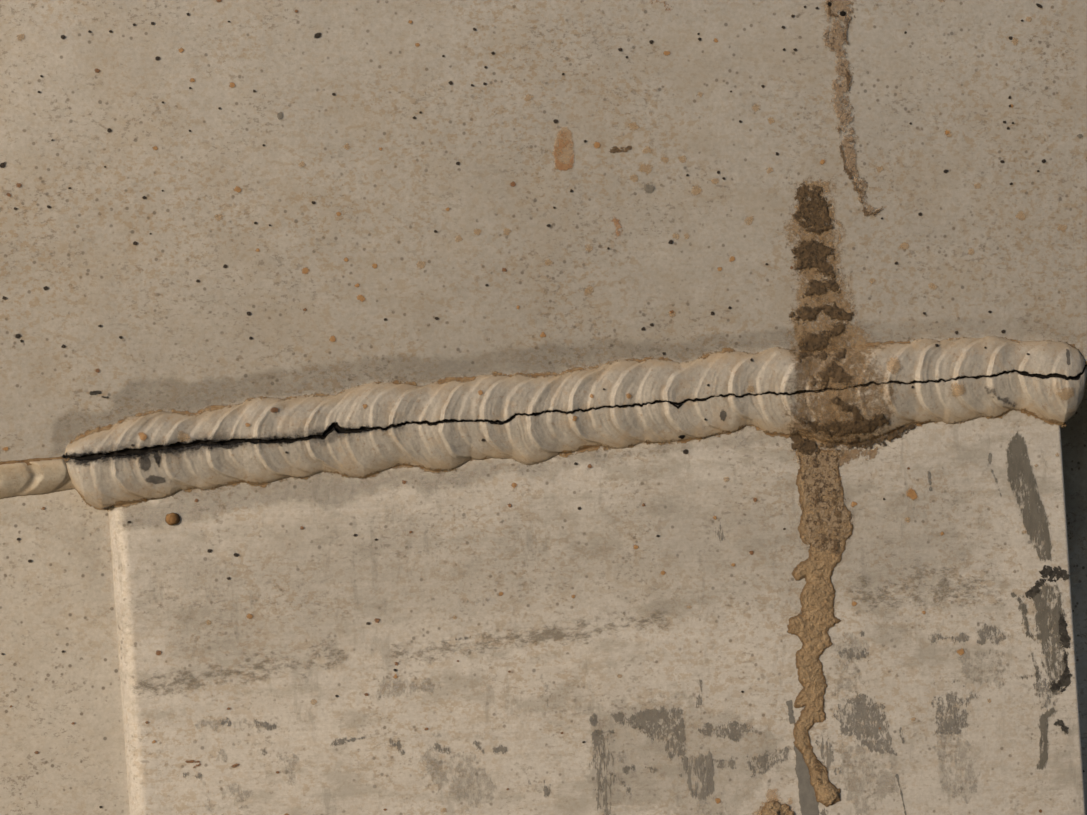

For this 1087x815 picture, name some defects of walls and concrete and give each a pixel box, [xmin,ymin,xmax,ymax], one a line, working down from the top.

crack [63,365,1087,467]